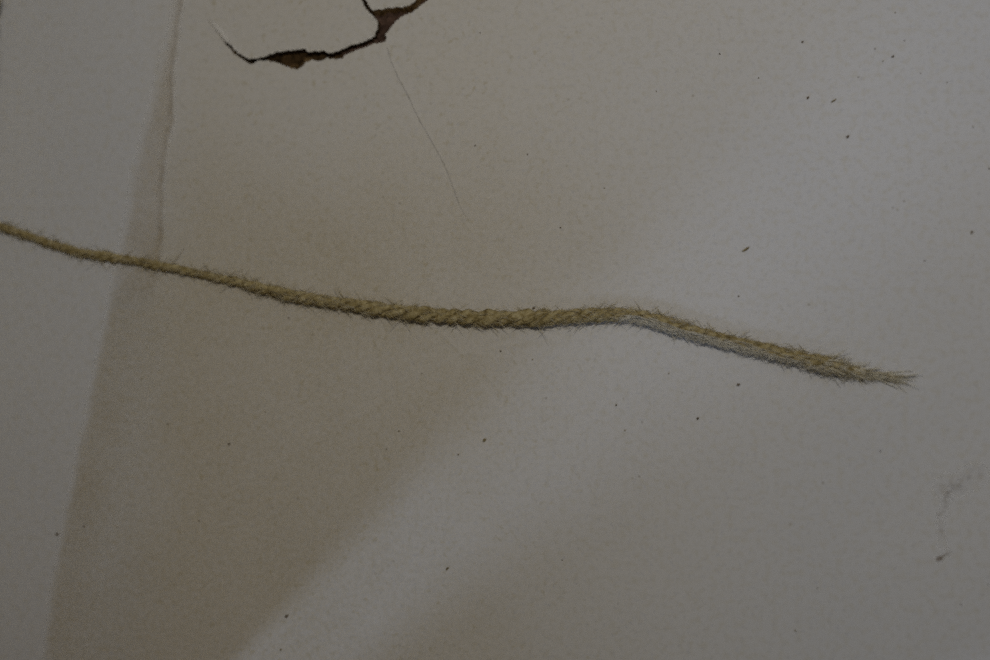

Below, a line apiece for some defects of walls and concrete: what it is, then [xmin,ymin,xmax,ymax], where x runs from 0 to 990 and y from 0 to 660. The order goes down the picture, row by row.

crack [202,0,471,220]